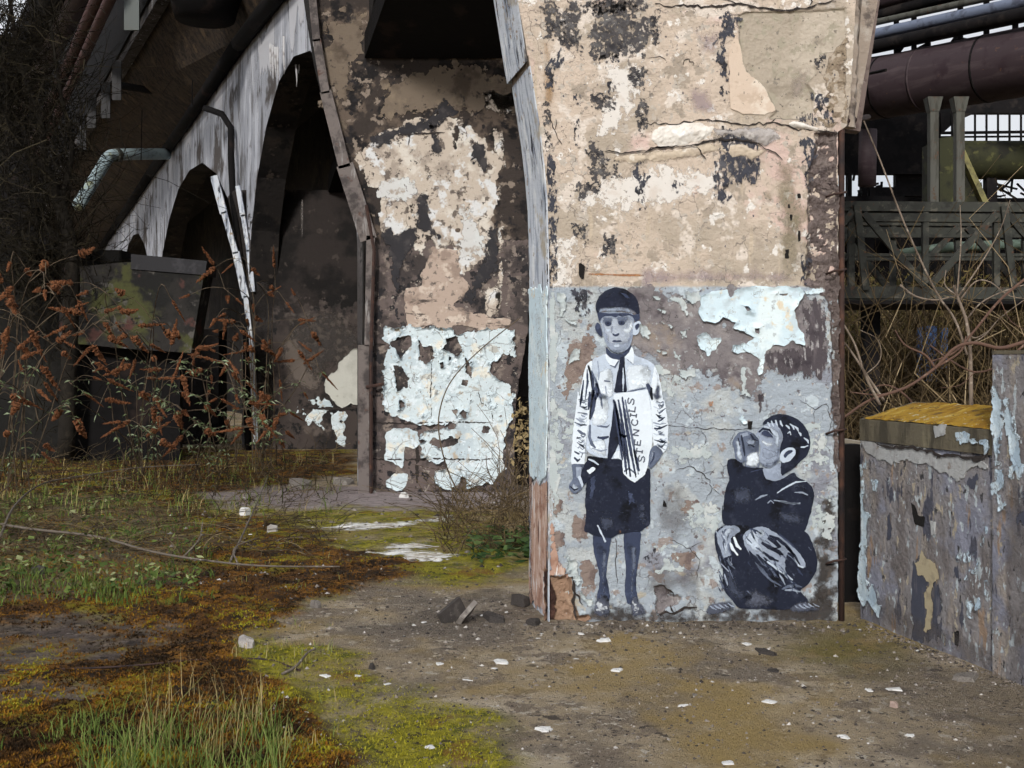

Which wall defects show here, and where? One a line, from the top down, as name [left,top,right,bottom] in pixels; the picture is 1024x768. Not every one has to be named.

damp [596,62,652,137]
damp [572,164,722,213]
crack [605,116,844,160]
damp [551,233,578,287]
peeling [617,7,849,472]
peeling [354,0,664,639]
peeling [283,334,357,447]
peeling [933,386,1024,512]
peeling [857,462,882,618]
peeling [915,550,939,633]
peeling [957,518,988,619]